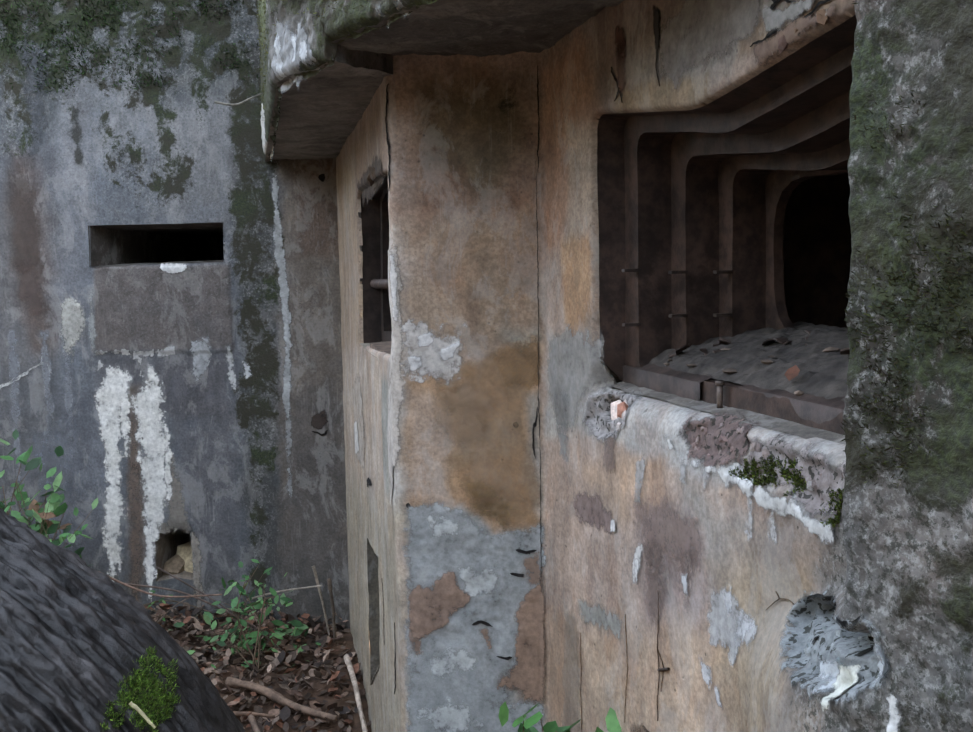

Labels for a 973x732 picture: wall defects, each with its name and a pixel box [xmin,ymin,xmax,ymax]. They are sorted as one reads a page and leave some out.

damp [21,44,48,156]
damp [70,107,83,164]
flaking render [653,0,835,89]
crack [750,0,830,47]
damp [8,331,21,482]
damp [32,290,204,615]
flaking render [387,244,463,505]
spalling [583,390,642,443]
spalling [679,413,846,519]
spalling [403,502,546,732]
spalling [779,590,890,703]